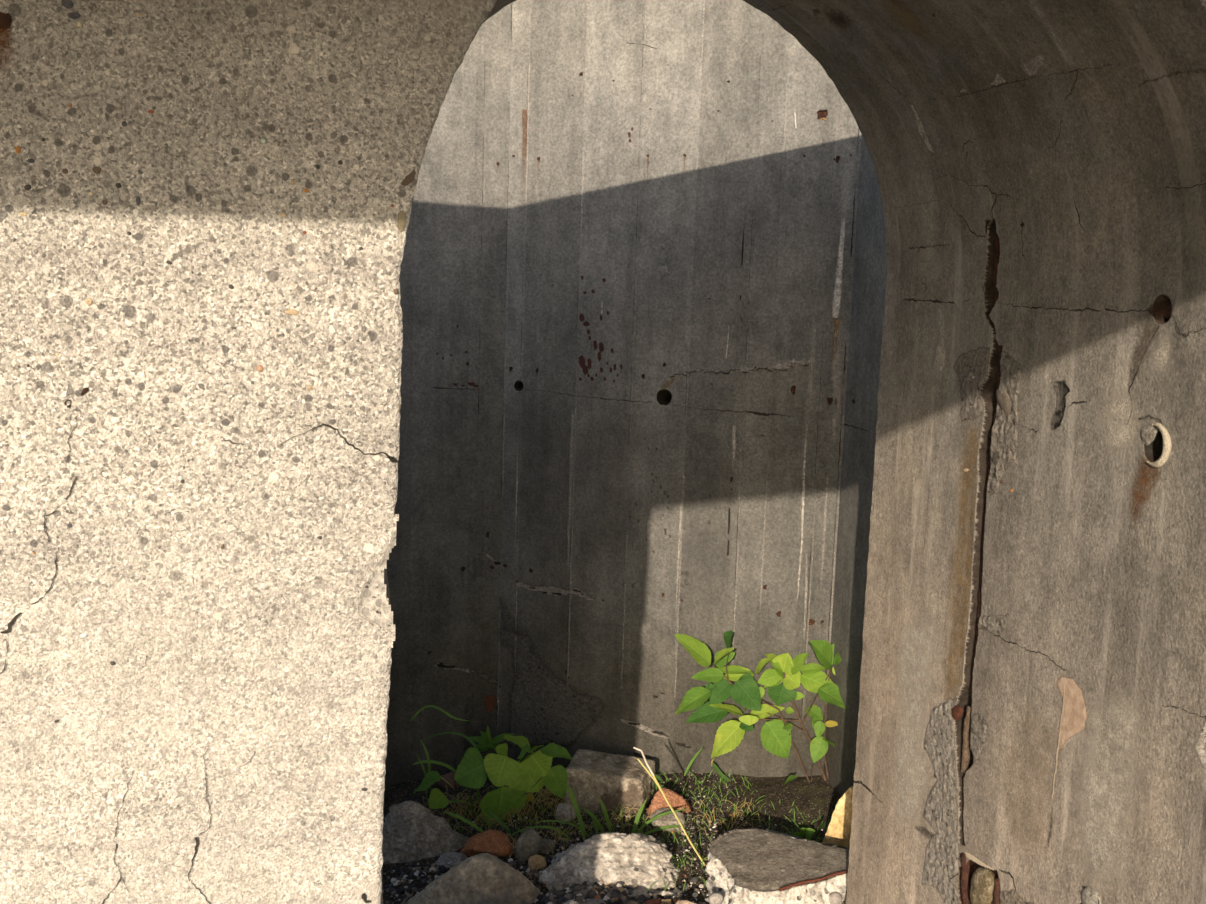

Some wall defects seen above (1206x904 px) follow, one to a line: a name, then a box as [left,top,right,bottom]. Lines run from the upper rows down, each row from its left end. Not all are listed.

rust [0,12,12,57]
crack [0,415,78,673]
crack [277,423,398,463]
crack [663,359,816,389]
crack [910,141,1063,867]
spalling [912,699,1033,904]